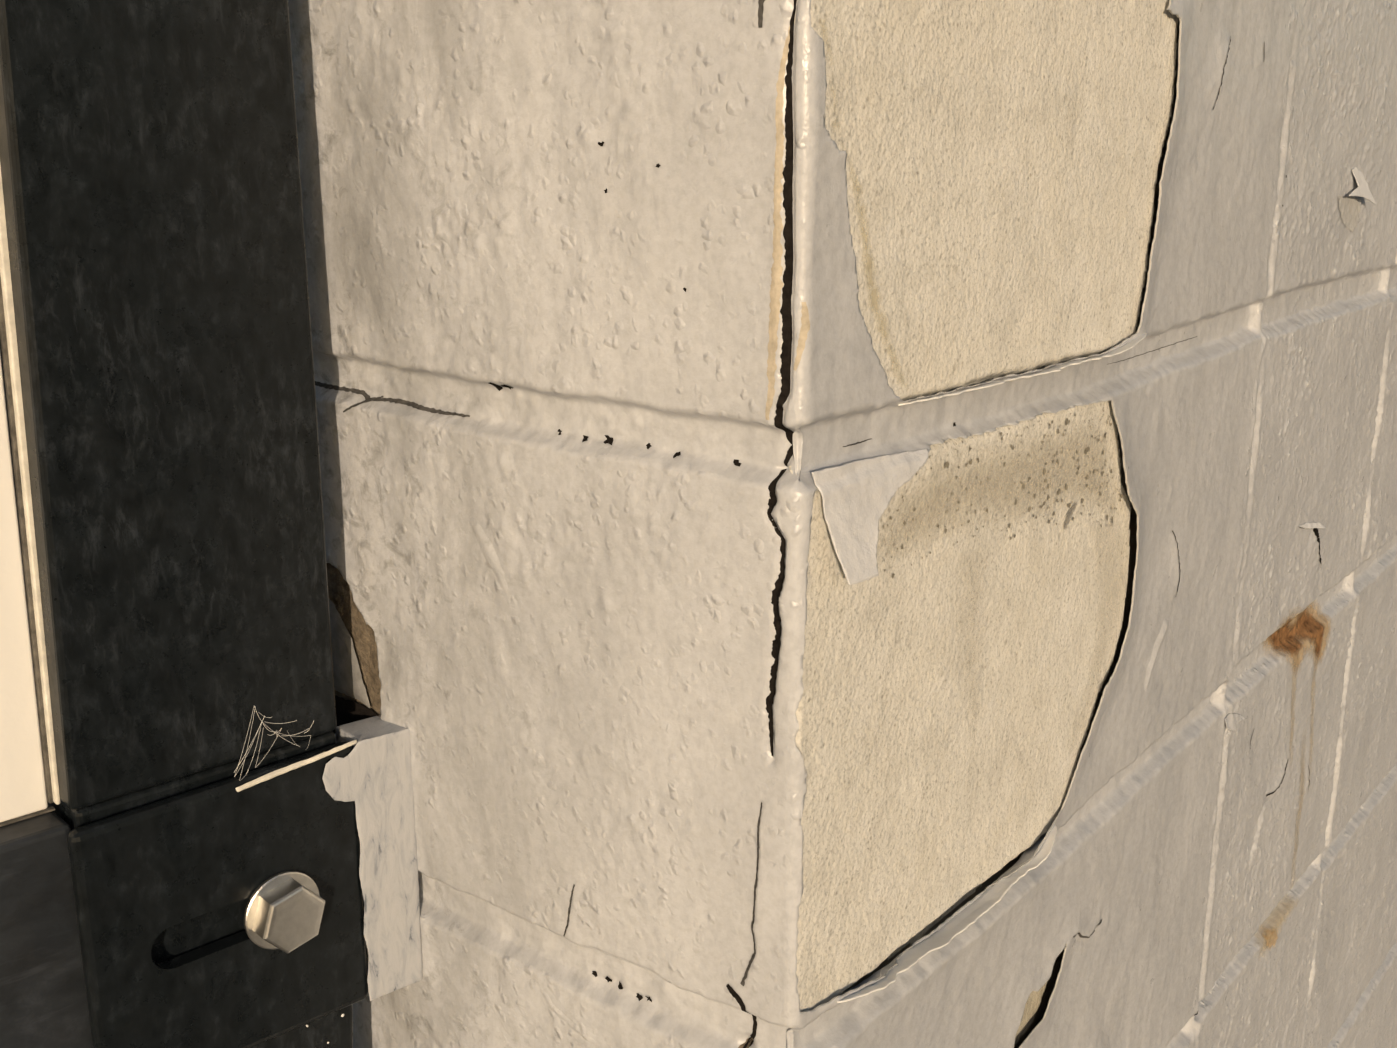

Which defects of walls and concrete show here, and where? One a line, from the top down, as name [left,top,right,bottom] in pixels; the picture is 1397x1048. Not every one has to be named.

peeling [794,0,1178,406]
peeling [1338,167,1376,232]
crack [758,0,810,756]
spalling [326,563,381,734]
peeling [795,401,1131,1012]
rust [1266,606,1330,667]
crack [726,802,762,1048]
peeling [1014,982,1047,1046]